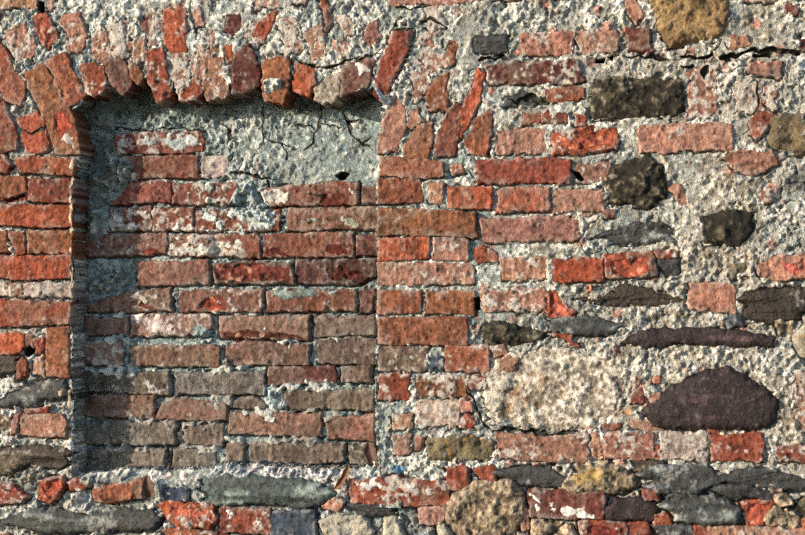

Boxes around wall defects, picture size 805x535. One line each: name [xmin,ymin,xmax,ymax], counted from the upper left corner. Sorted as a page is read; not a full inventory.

crack [626,46,801,79]
crack [261,104,372,160]
crack [231,171,278,188]